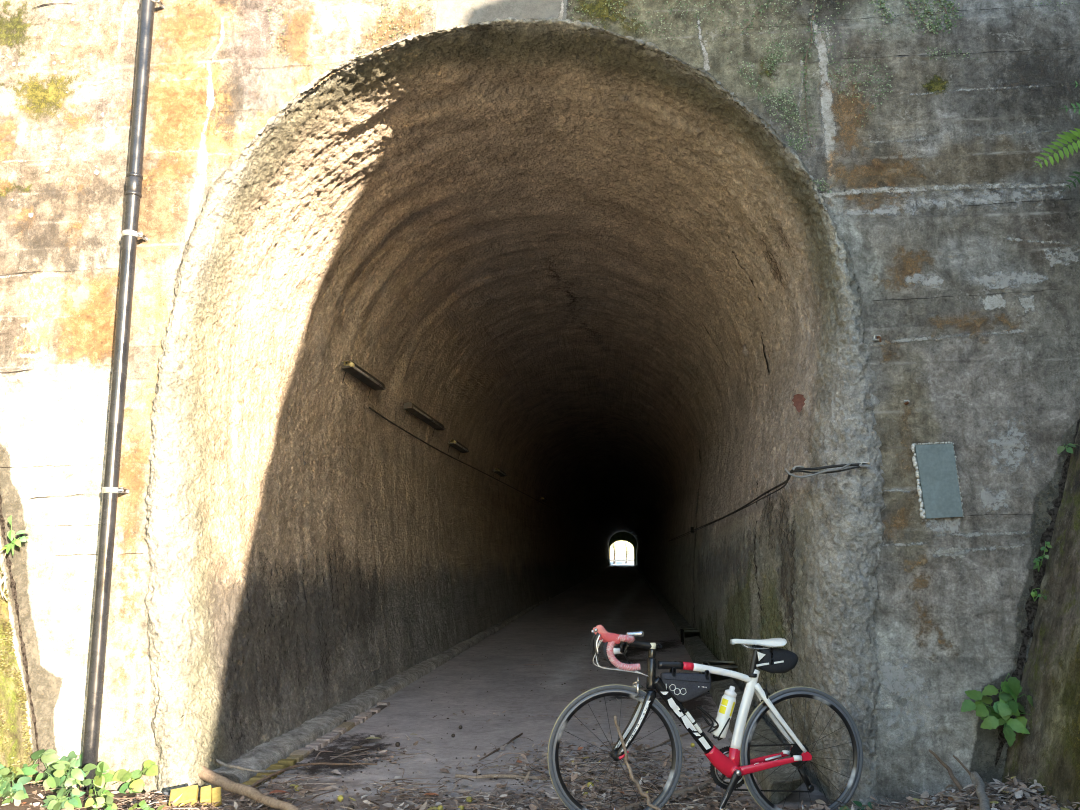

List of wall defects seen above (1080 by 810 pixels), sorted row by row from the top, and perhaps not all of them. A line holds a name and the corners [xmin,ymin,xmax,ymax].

corrosion [61,104,93,136]
corrosion [142,0,221,194]
leakage [185,18,225,242]
leakage [810,21,836,179]
corrosion [819,74,926,213]
corrosion [12,271,120,368]
leakage [203,537,392,752]